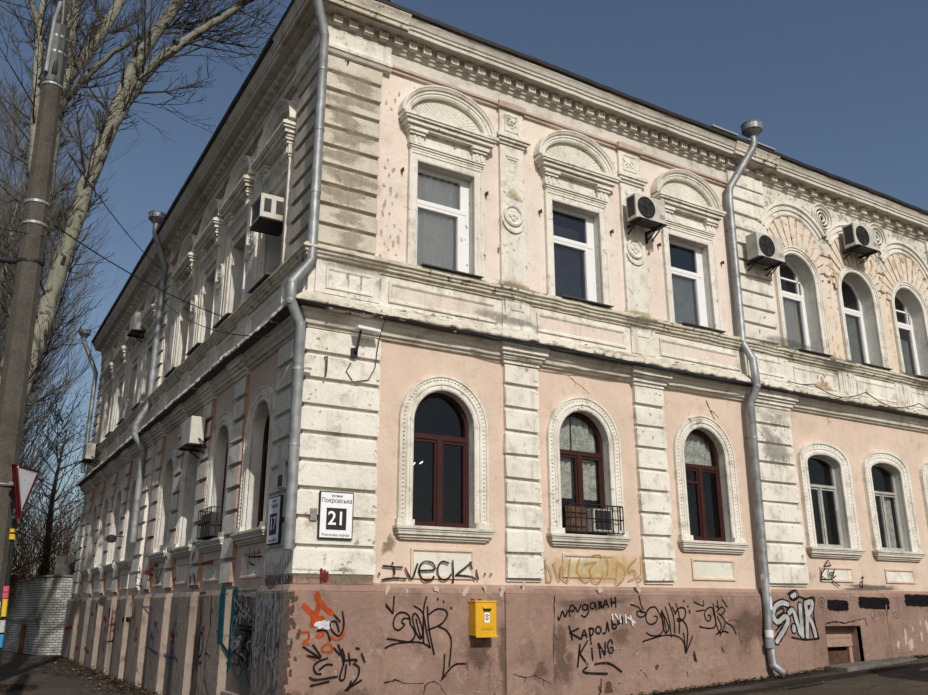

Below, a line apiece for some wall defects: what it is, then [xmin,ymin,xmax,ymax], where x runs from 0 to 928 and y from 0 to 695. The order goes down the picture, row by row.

peeling [379,159,400,257]
spalling [277,591,301,695]
crack [384,675,447,694]